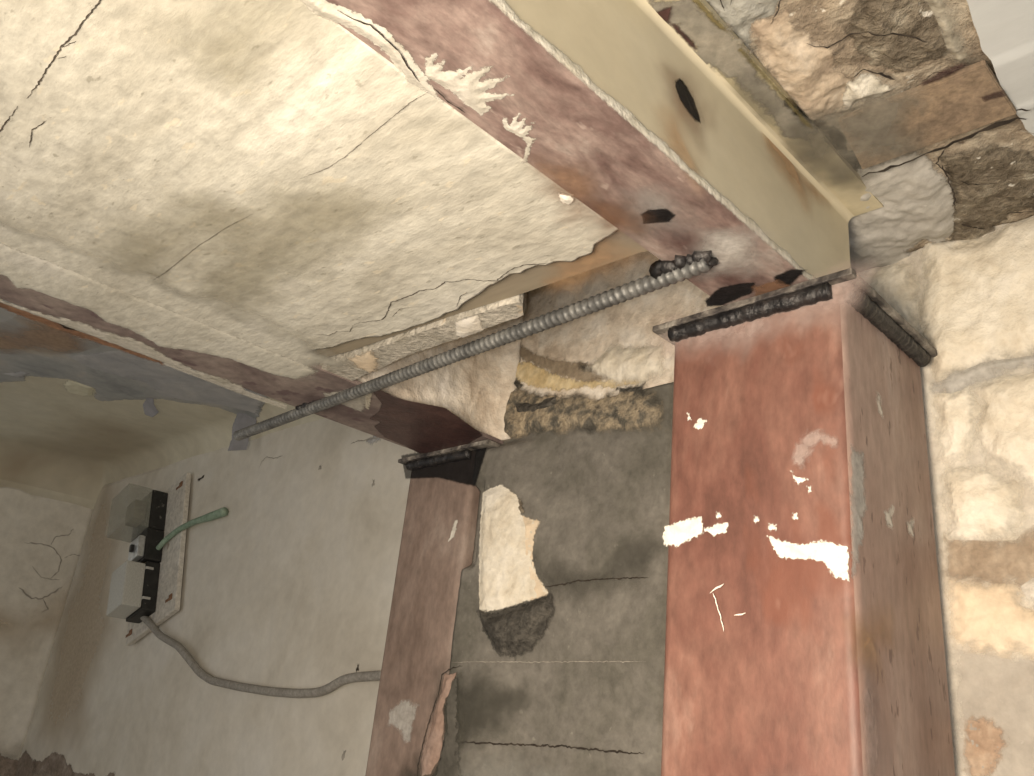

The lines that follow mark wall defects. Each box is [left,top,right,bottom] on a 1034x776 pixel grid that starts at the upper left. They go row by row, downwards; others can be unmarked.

crack [0,0,101,148]
flaking render [648,0,967,139]
peeling [558,193,574,205]
peeling [0,299,269,451]
crack [19,529,80,612]
flaking render [478,485,548,612]
peeling [662,512,728,547]
peeling [754,448,866,581]
peeling [417,666,459,776]
crack [462,741,643,754]